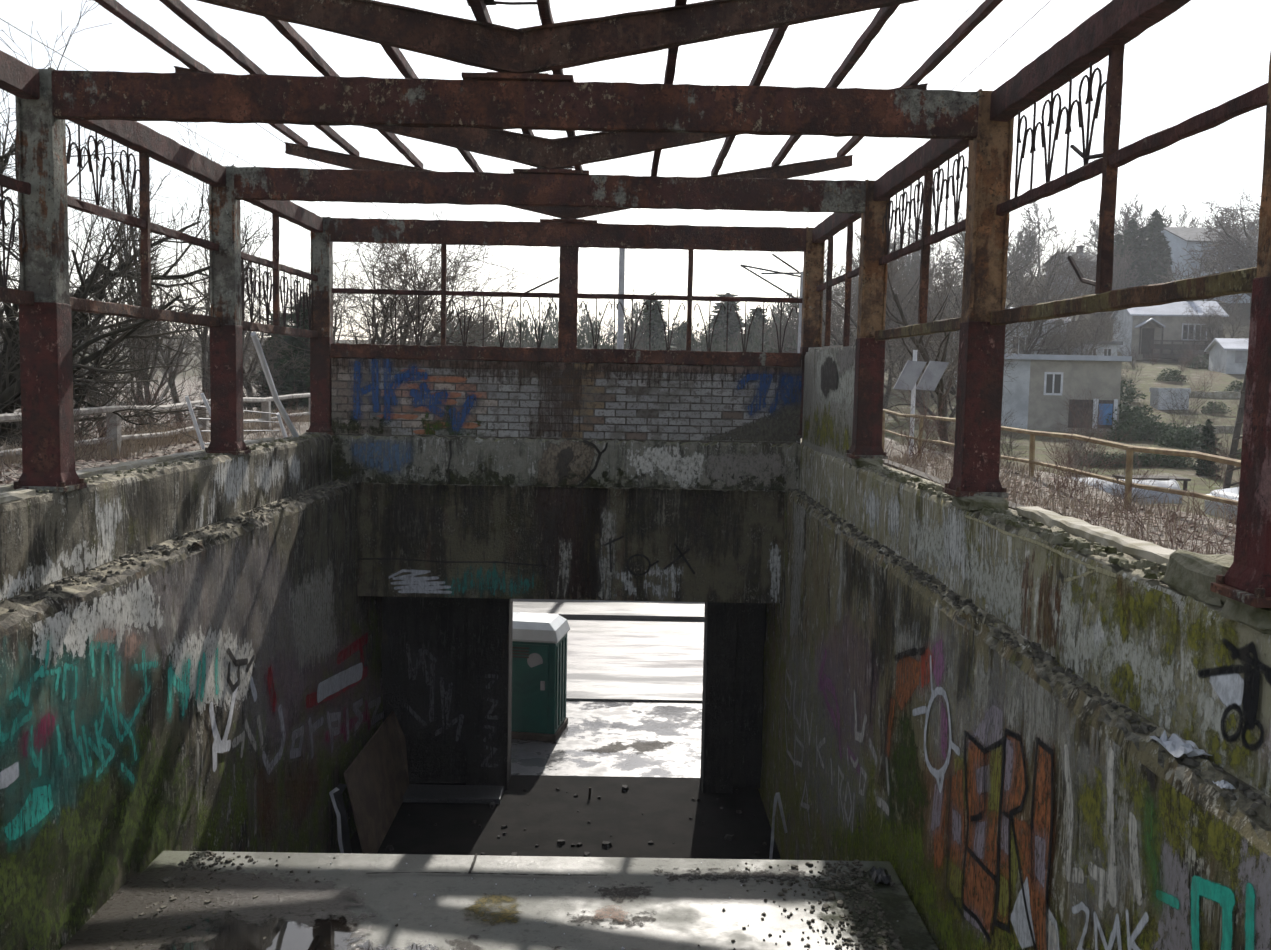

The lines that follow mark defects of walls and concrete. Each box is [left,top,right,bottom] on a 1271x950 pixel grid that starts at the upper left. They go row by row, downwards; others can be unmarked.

damp [530,445,748,601]
damp [863,485,945,581]
damp [835,539,1053,771]
corrosion [1021,552,1062,652]
damp [1105,742,1142,913]